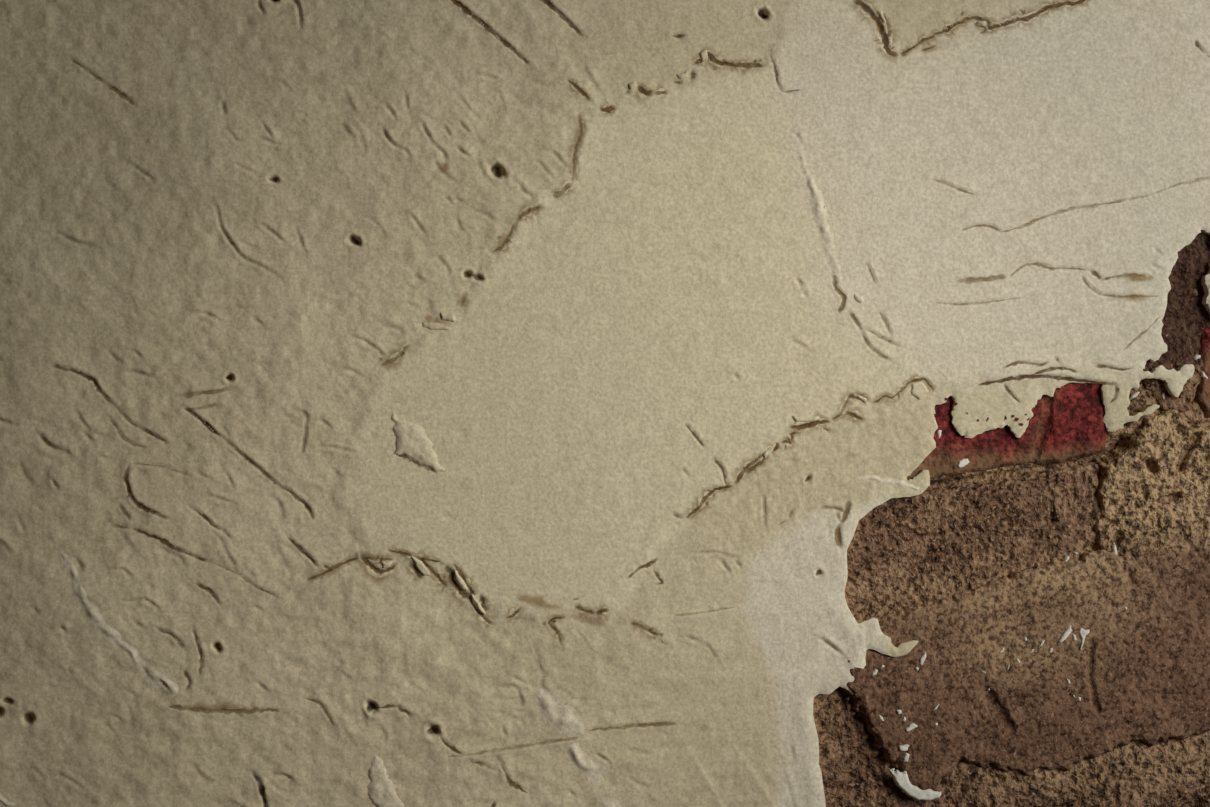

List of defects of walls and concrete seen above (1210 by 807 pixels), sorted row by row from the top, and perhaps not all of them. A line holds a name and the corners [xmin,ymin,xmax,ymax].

crack [855,0,1085,56]
crack [496,49,796,251]
crack [387,312,456,363]
crack [187,409,241,454]
crack [676,375,932,517]
crack [287,490,313,517]
spalling [813,231,1210,807]
crack [289,538,519,623]
crack [630,561,664,584]
crack [548,609,607,632]